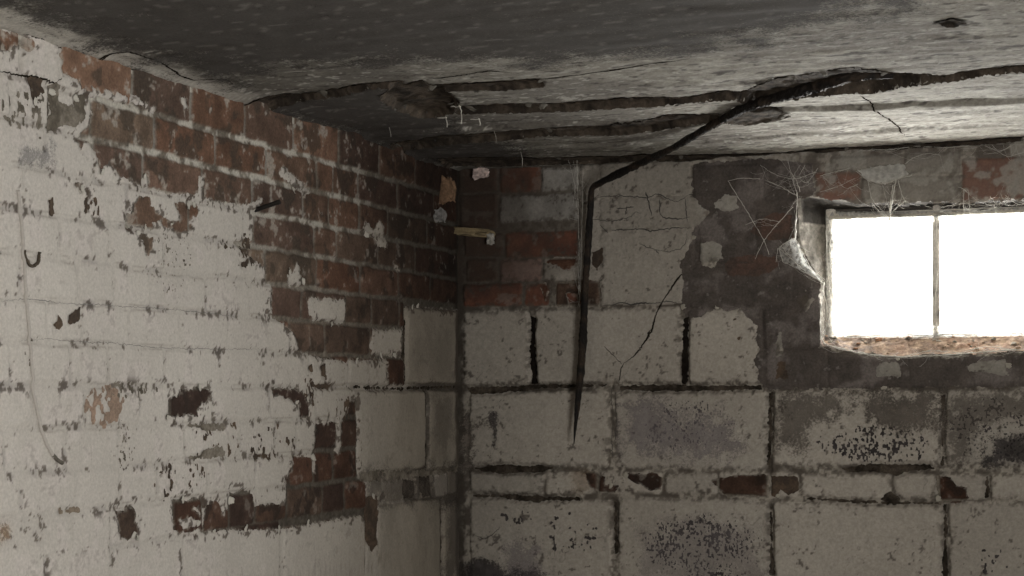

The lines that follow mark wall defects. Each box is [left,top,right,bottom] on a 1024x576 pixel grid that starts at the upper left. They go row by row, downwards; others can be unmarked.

peeling [0,29,35,52]
crack [434,71,509,79]
crack [548,59,685,79]
crack [861,96,905,136]
peeling [2,47,1024,419]
crack [593,192,692,461]
peeling [84,381,158,471]
peeling [154,383,458,552]
water stain [771,386,1024,471]
peeling [115,505,139,541]